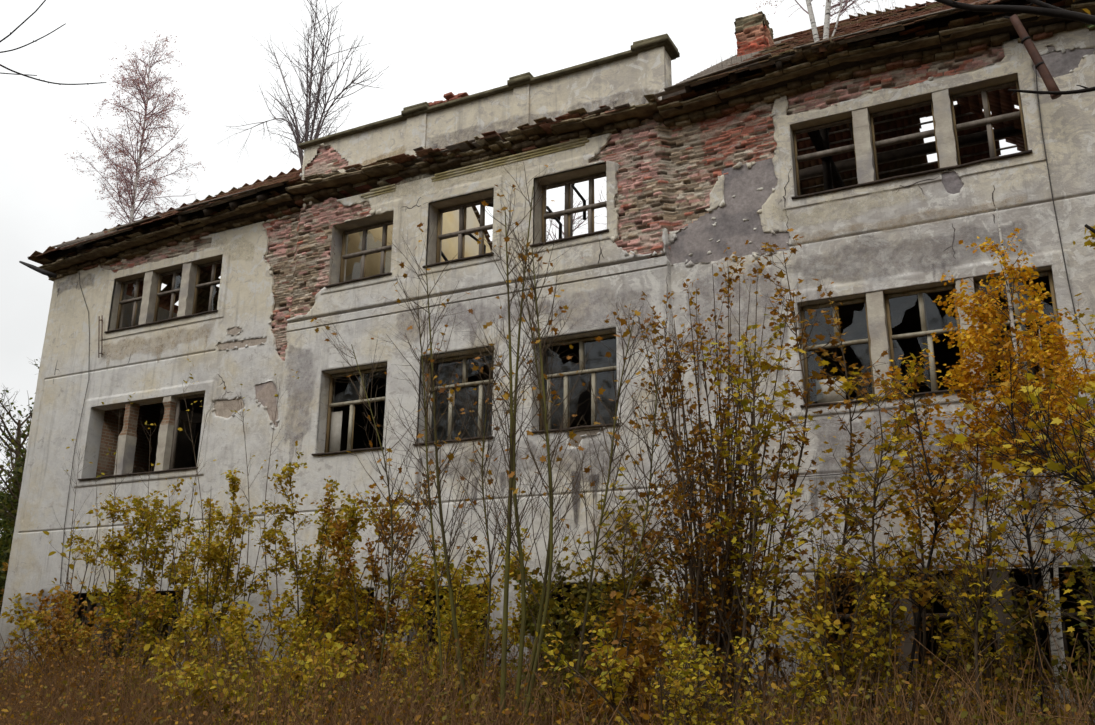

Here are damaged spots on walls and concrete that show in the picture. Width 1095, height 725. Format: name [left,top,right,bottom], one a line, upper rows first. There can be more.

peeling [1032,43,1095,78]
flaking render [589,44,1005,267]
flaking render [217,197,376,361]
peeling [212,381,279,429]